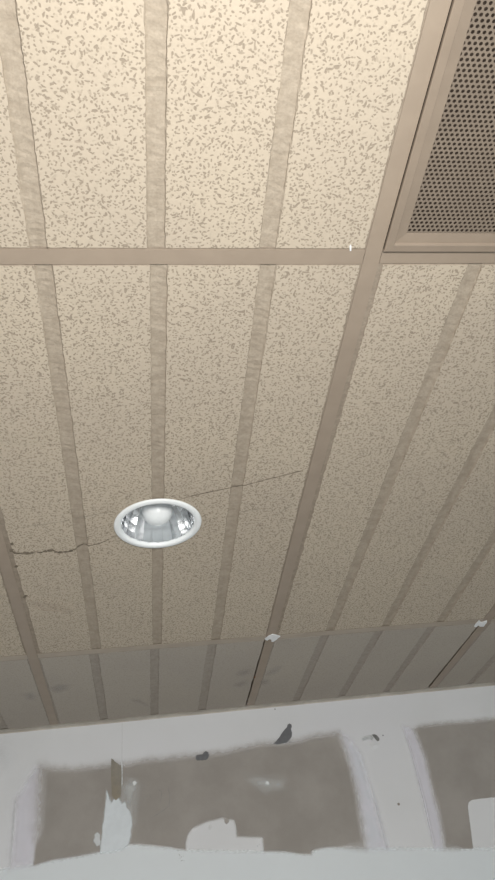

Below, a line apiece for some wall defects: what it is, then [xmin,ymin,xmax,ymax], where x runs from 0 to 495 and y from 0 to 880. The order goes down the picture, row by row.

crack [177,470,303,500]
crack [10,510,116,555]